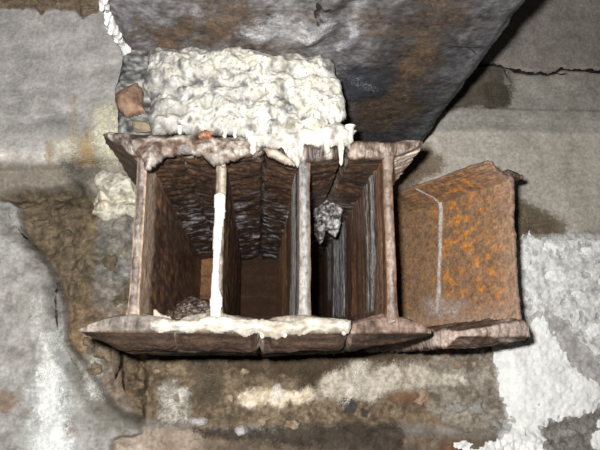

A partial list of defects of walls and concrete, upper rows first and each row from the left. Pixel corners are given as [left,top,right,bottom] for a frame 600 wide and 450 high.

crack [448,46,600,79]
water stain [444,65,514,110]
water stain [130,14,398,340]
crack [111,351,126,393]